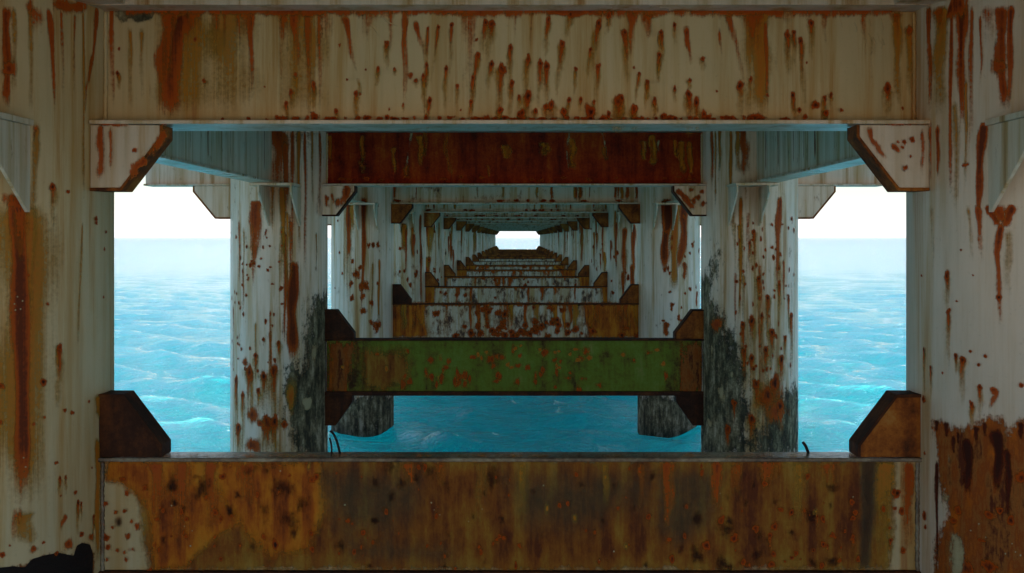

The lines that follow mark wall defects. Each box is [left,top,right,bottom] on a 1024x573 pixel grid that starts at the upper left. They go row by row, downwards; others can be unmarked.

rust [2,8,17,104]
rust [27,0,913,336]
rust [867,0,1016,315]
water stain [282,291,394,452]
rust [0,124,1024,573]
water stain [637,243,798,452]